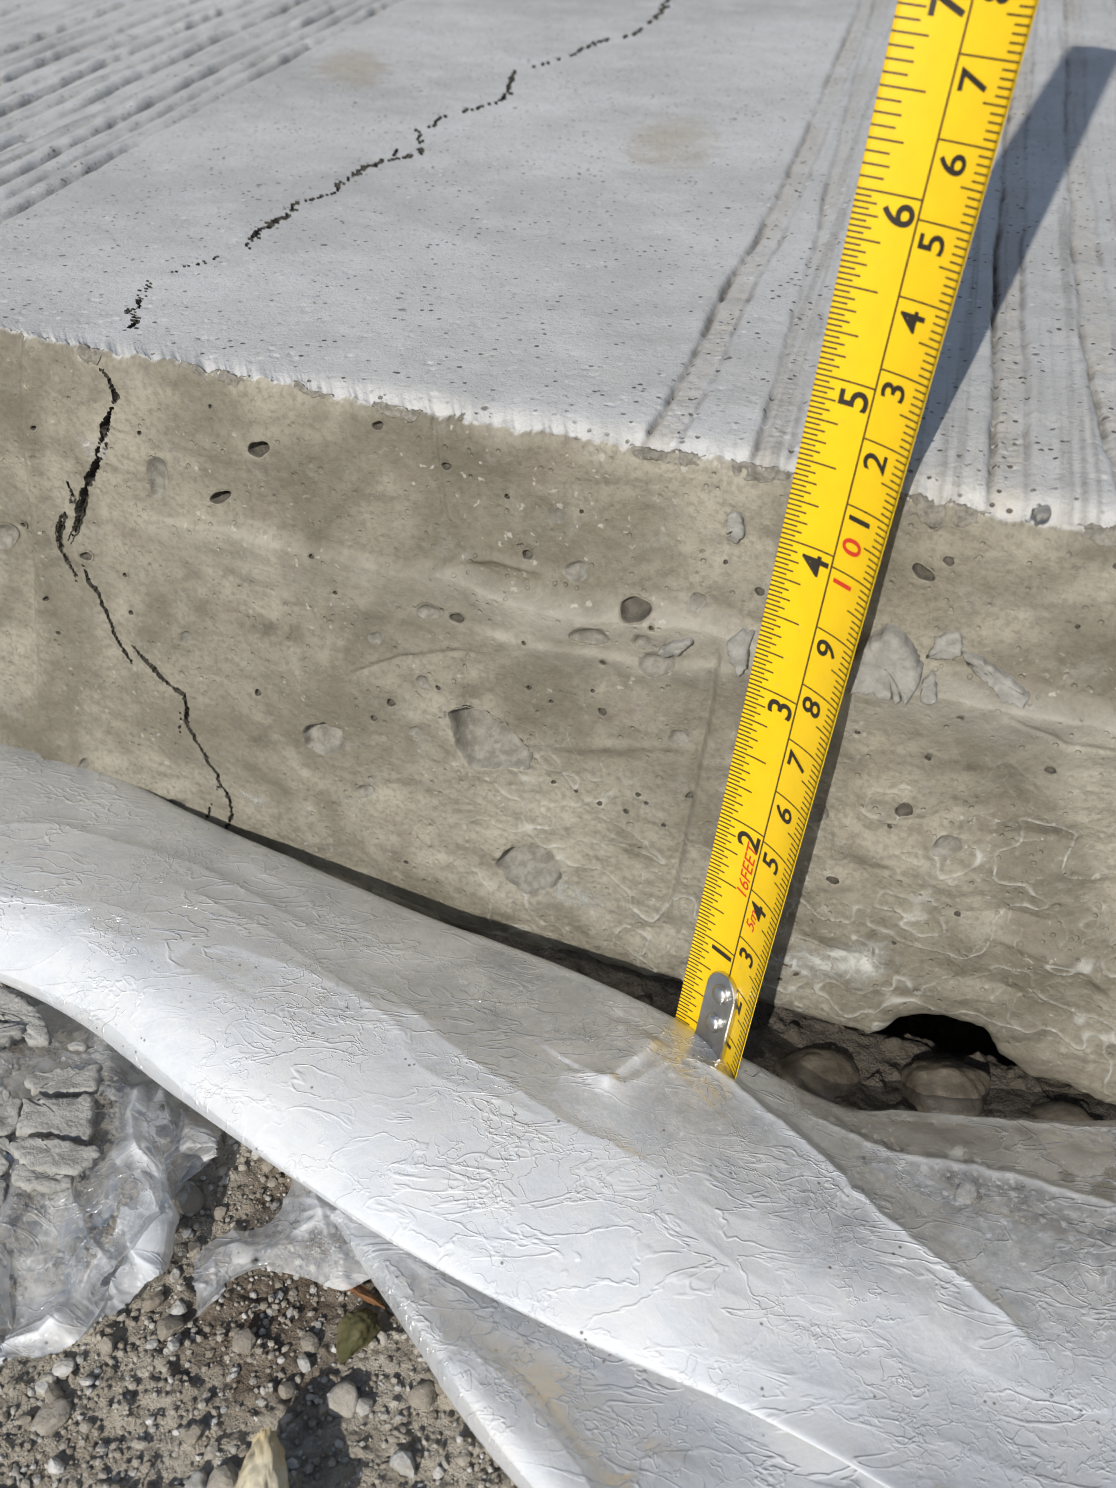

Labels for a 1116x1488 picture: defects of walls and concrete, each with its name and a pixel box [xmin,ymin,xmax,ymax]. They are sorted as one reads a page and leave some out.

crack [124,0,670,329]
crack [55,368,234,830]